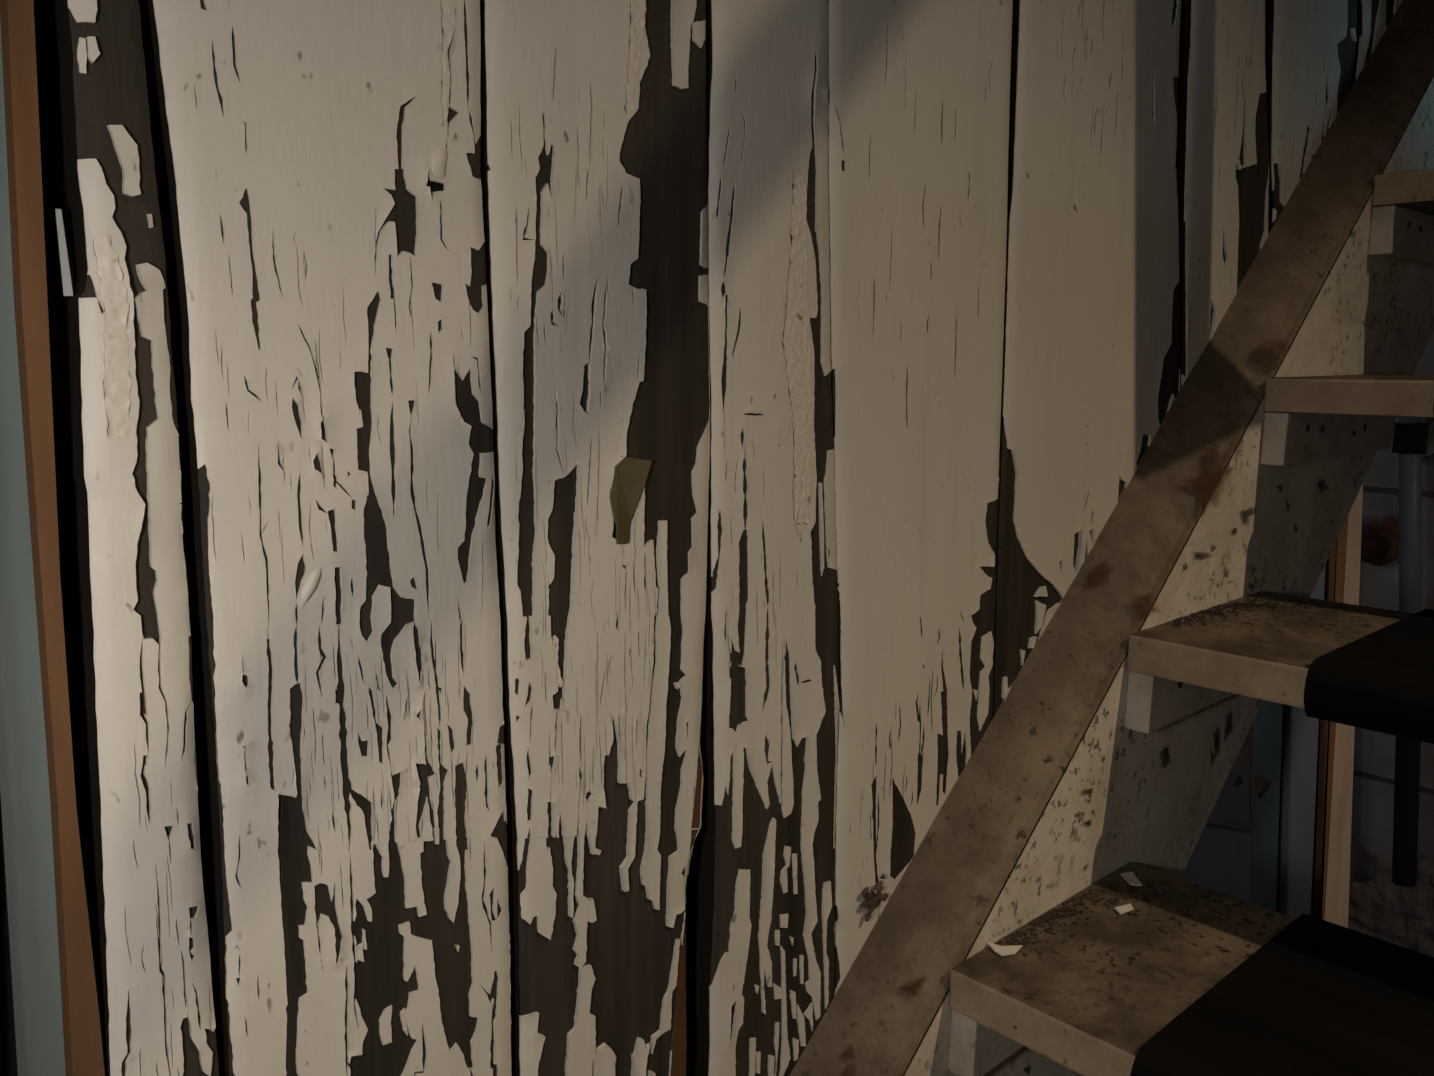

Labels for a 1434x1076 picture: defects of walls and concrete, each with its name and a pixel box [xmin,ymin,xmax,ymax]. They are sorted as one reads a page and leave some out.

peeling [69,0,178,644]
peeling [1188,459,1232,512]
peeling [278,0,843,1076]
peeling [1060,530,1091,568]
peeling [1184,544,1216,570]
peeling [1233,509,1256,534]
peeling [917,417,1061,805]
peeling [1210,711,1232,768]